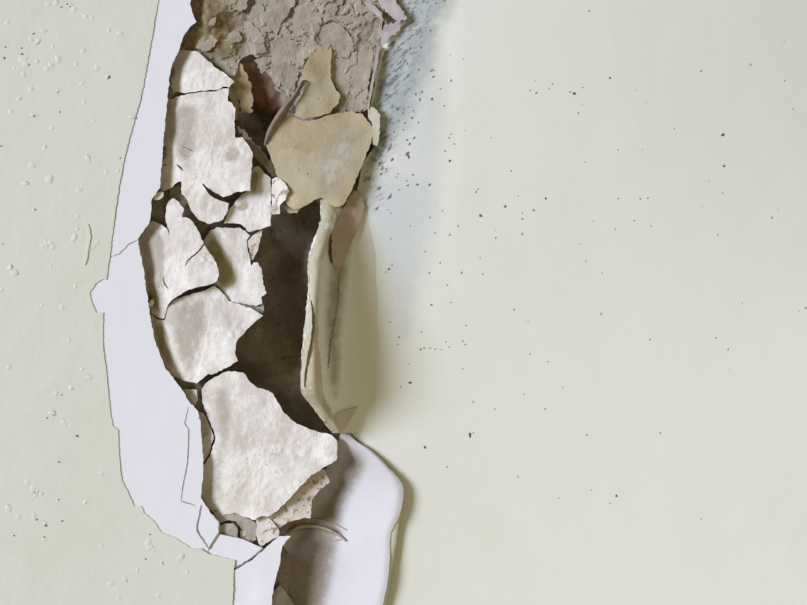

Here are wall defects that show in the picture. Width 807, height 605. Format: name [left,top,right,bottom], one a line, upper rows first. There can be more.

leakage [363,0,446,252]
flaking render [90,0,407,605]
crack [181,410,219,554]